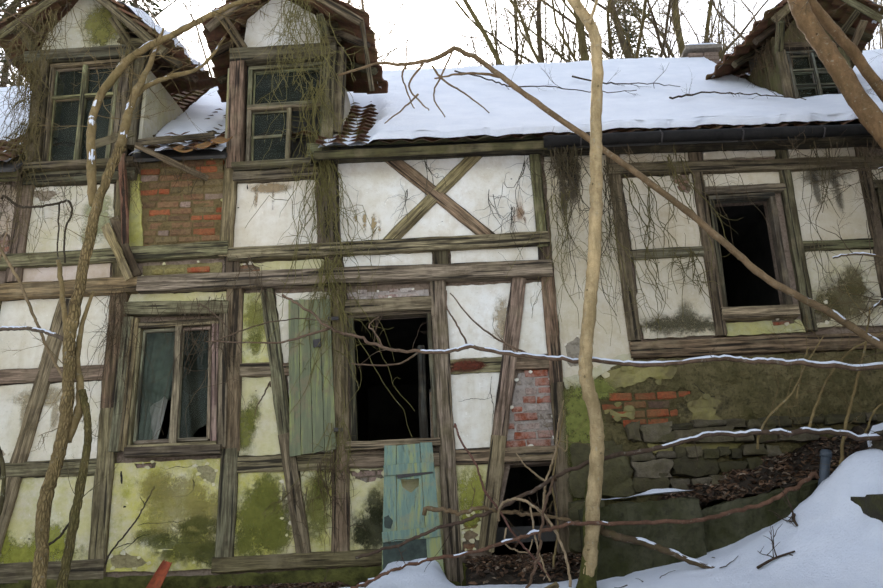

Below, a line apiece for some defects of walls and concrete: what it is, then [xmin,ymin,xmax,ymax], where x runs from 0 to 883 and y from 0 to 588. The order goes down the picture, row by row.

spalling [138,140,225,246]
water stain [645,303,715,335]
water stain [815,268,875,321]
peeling [563,335,580,390]
water stain [247,398,260,428]
spalling [506,369,554,447]
spalling [592,353,722,428]
water stain [255,474,279,508]
water stain [48,525,67,555]
water stain [137,529,169,545]
water stain [182,517,217,567]
water stain [235,517,291,556]